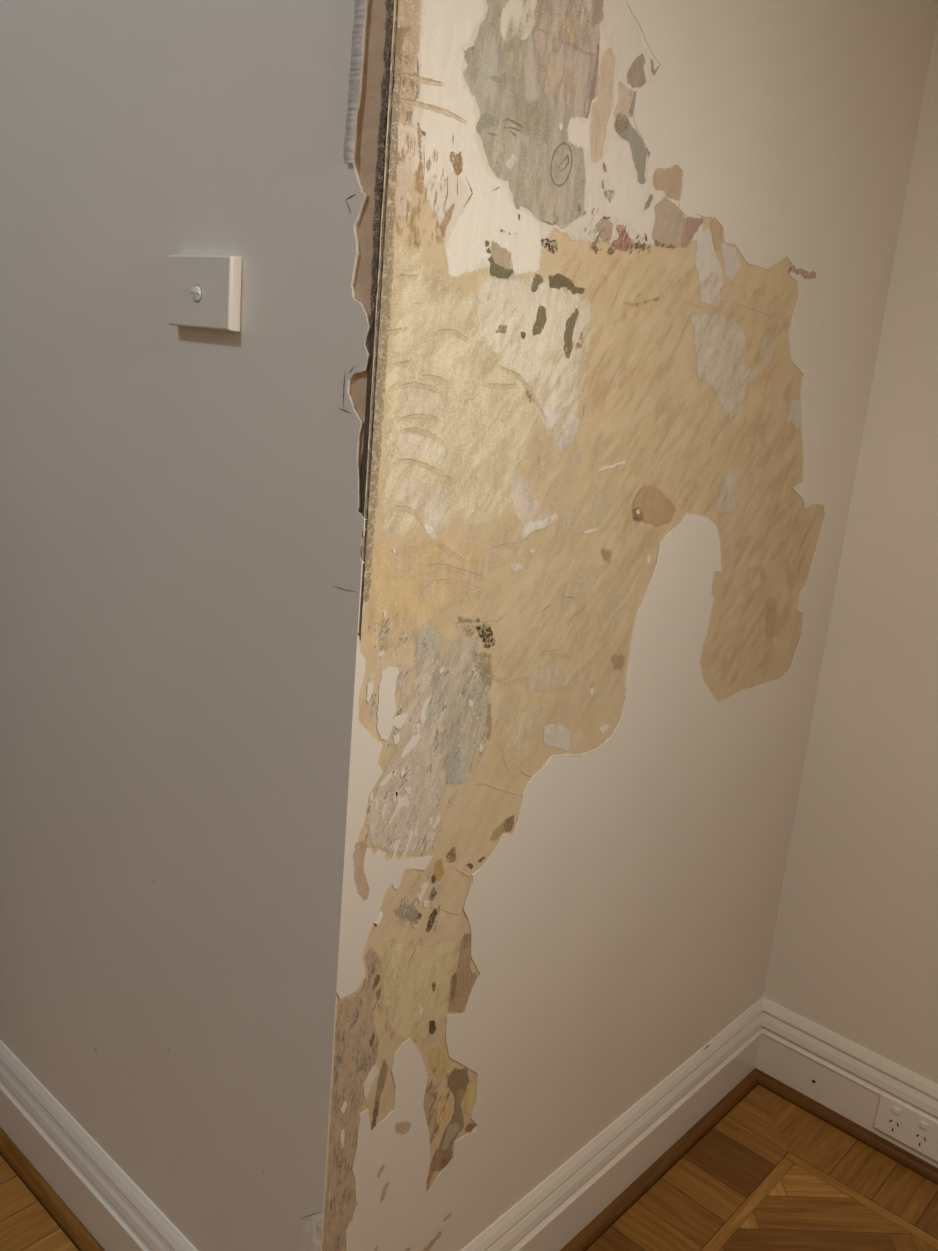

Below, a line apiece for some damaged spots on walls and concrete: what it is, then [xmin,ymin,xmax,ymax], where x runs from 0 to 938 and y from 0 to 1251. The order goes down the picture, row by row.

peeling [322,0,825,1251]